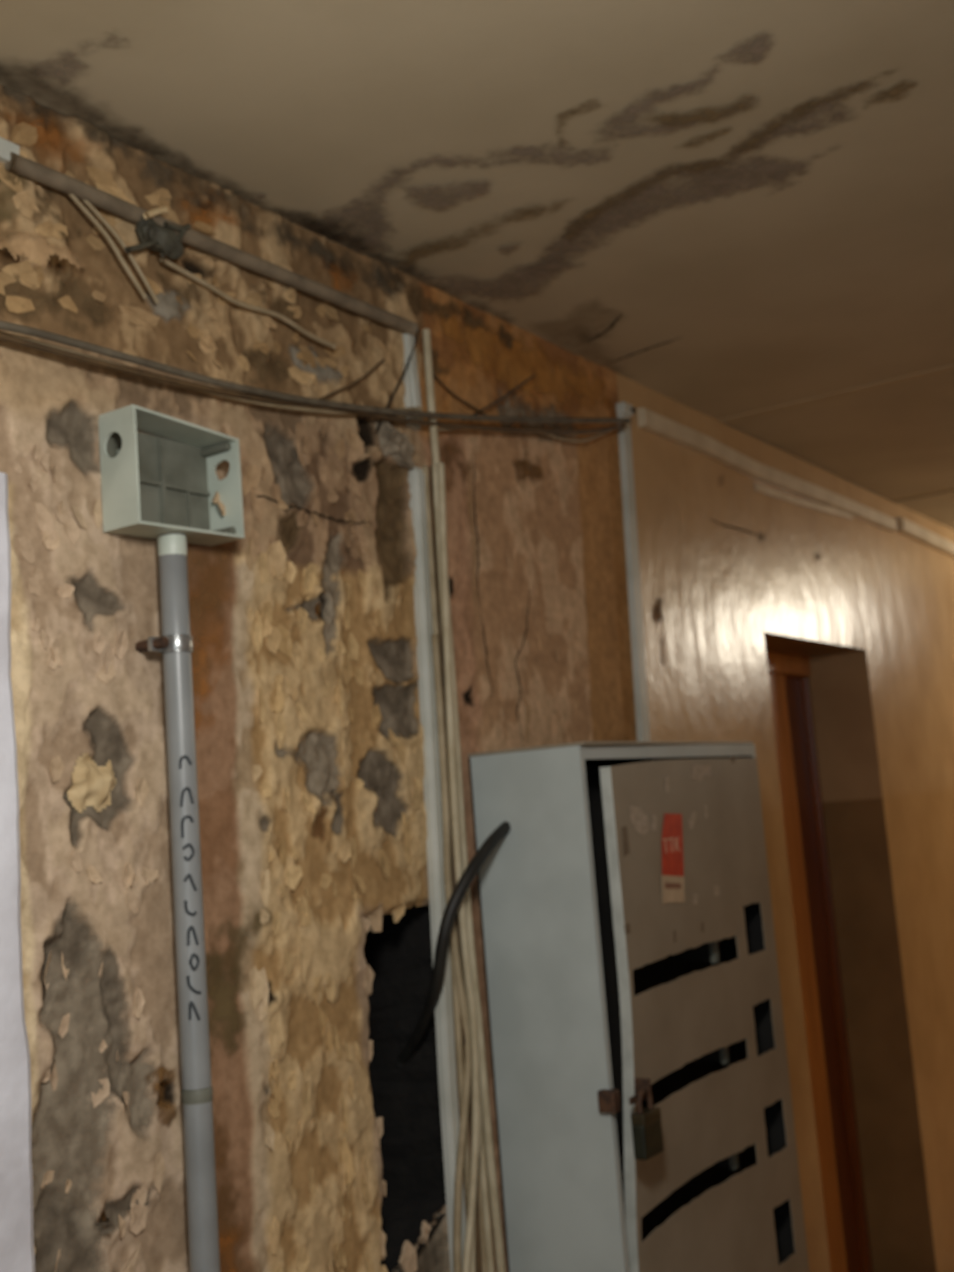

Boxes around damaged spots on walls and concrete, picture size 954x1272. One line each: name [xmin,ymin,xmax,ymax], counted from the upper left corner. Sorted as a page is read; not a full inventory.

peeling [0,259,45,314]
peeling [65,166,216,235]
water stain [244,348,287,381]
peeling [186,274,349,384]
water stain [0,54,865,348]
peeling [12,401,103,597]
crack [243,492,372,524]
spalling [57,573,129,685]
crack [468,454,531,747]
spalling [50,708,149,884]
spalling [242,418,450,1272]
spalling [32,902,165,1272]